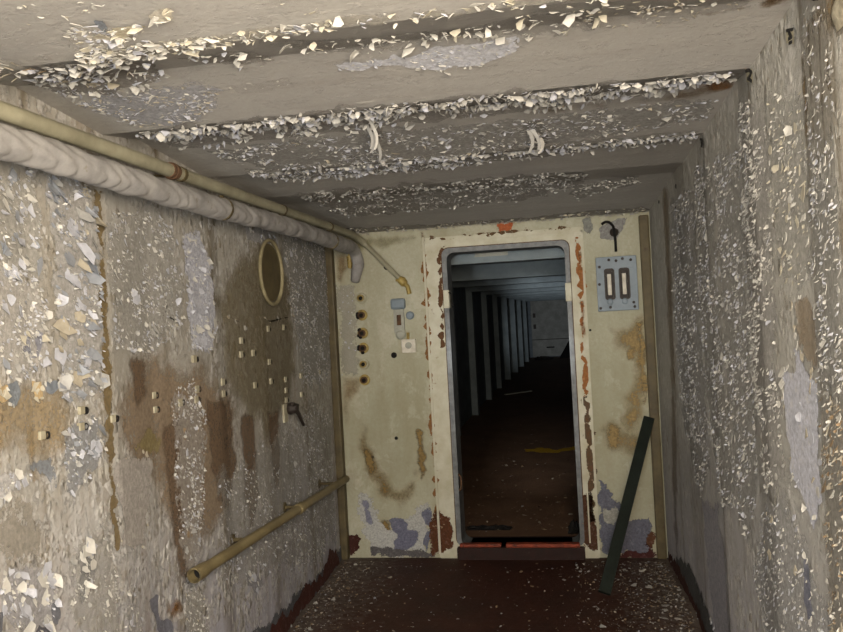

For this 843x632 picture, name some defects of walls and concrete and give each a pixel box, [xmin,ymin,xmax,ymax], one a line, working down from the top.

peeling [0,0,741,218]
peeling [0,449,153,632]
peeling [61,413,108,497]
peeling [0,168,218,408]
peeling [170,378,210,632]
water stain [221,251,293,431]
peeling [219,403,342,632]
peeling [244,227,356,391]
peeling [357,493,435,558]
rust [421,222,598,556]
peeling [597,480,621,555]
peeling [621,518,653,554]